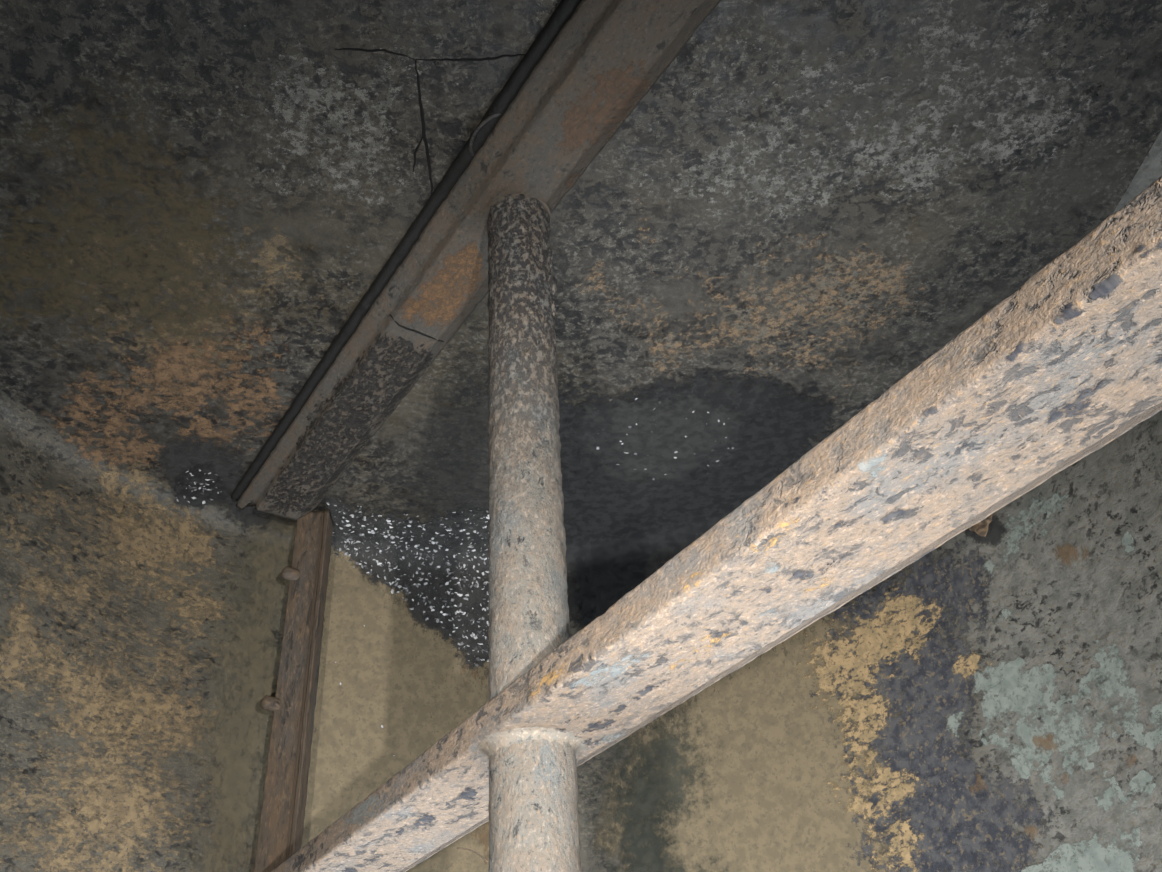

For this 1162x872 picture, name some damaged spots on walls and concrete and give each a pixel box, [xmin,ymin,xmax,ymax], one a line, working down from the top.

rust [0,214,324,872]
rust [301,547,489,848]
rust [406,821,489,872]